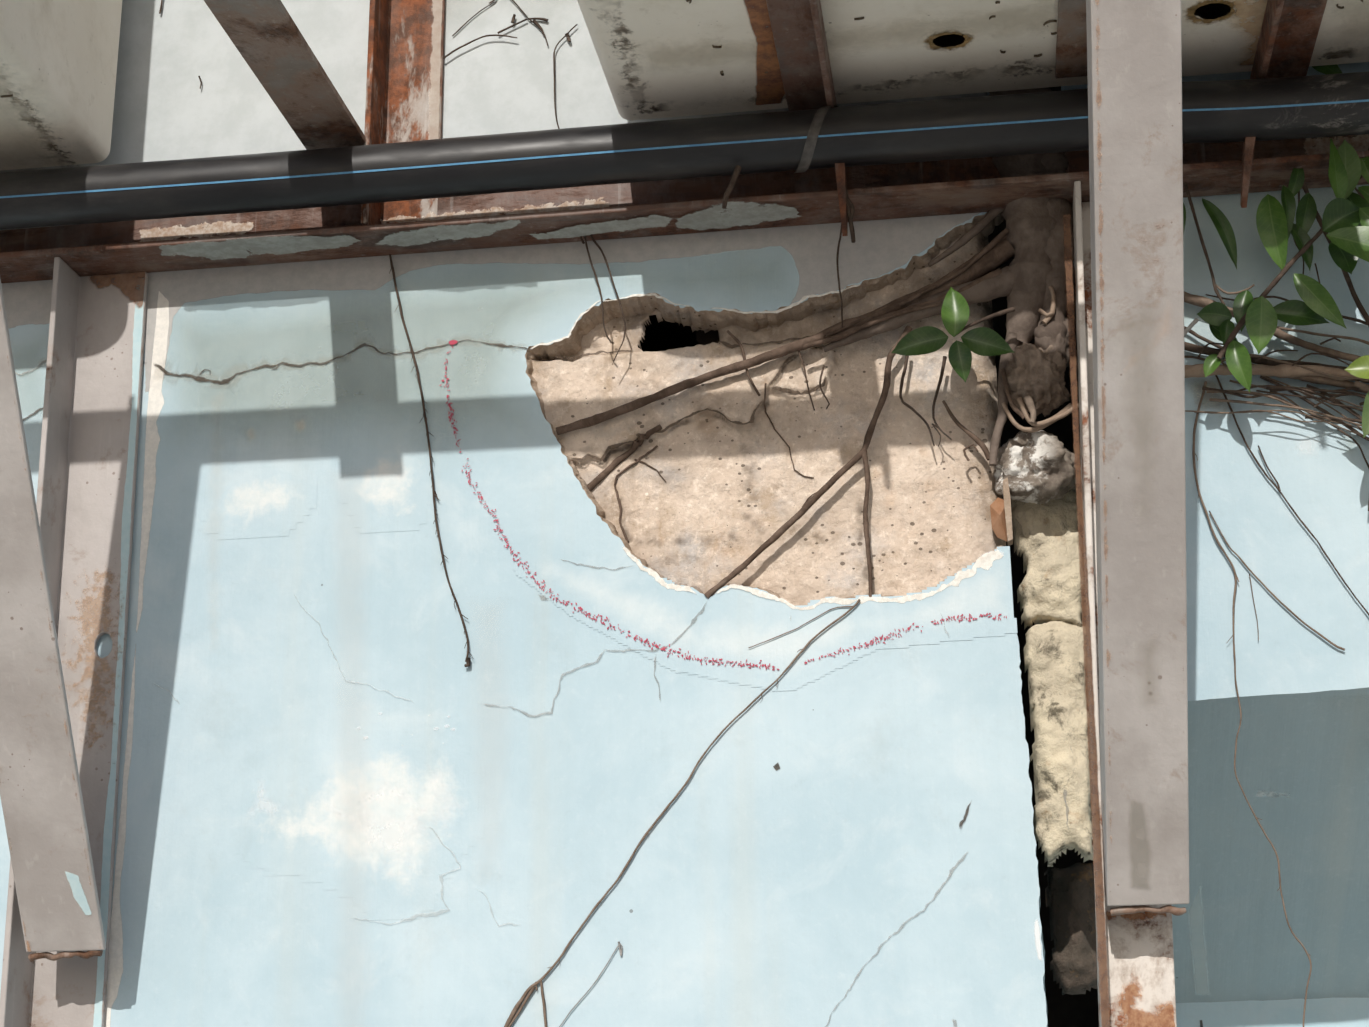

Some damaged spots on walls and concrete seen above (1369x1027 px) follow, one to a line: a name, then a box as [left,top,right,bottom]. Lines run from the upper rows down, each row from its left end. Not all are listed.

crack [155,339,528,384]
spalling [145,212,1013,610]
rust [1063,214,1175,1027]